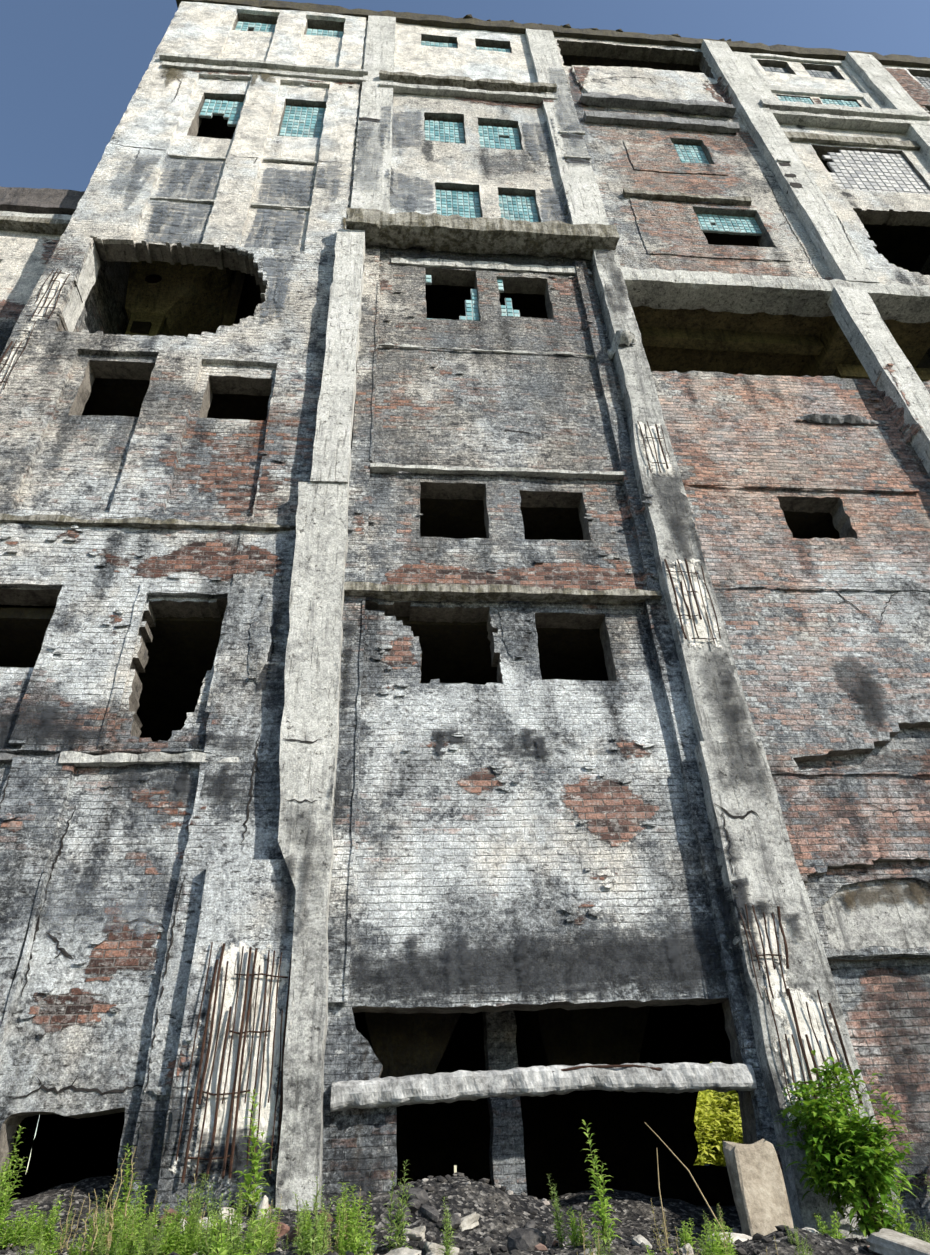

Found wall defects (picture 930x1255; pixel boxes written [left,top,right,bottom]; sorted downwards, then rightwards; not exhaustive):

flaking render [188,450,287,517]
spalling [636,419,675,477]
flaking render [88,539,284,581]
flaking render [381,553,723,649]
damp [66,728,81,751]
crack [241,735,322,845]
flaking render [543,766,660,846]
crack [21,805,76,997]
flaking render [20,895,168,1037]
damp [408,934,420,958]
spalling [729,904,863,1132]